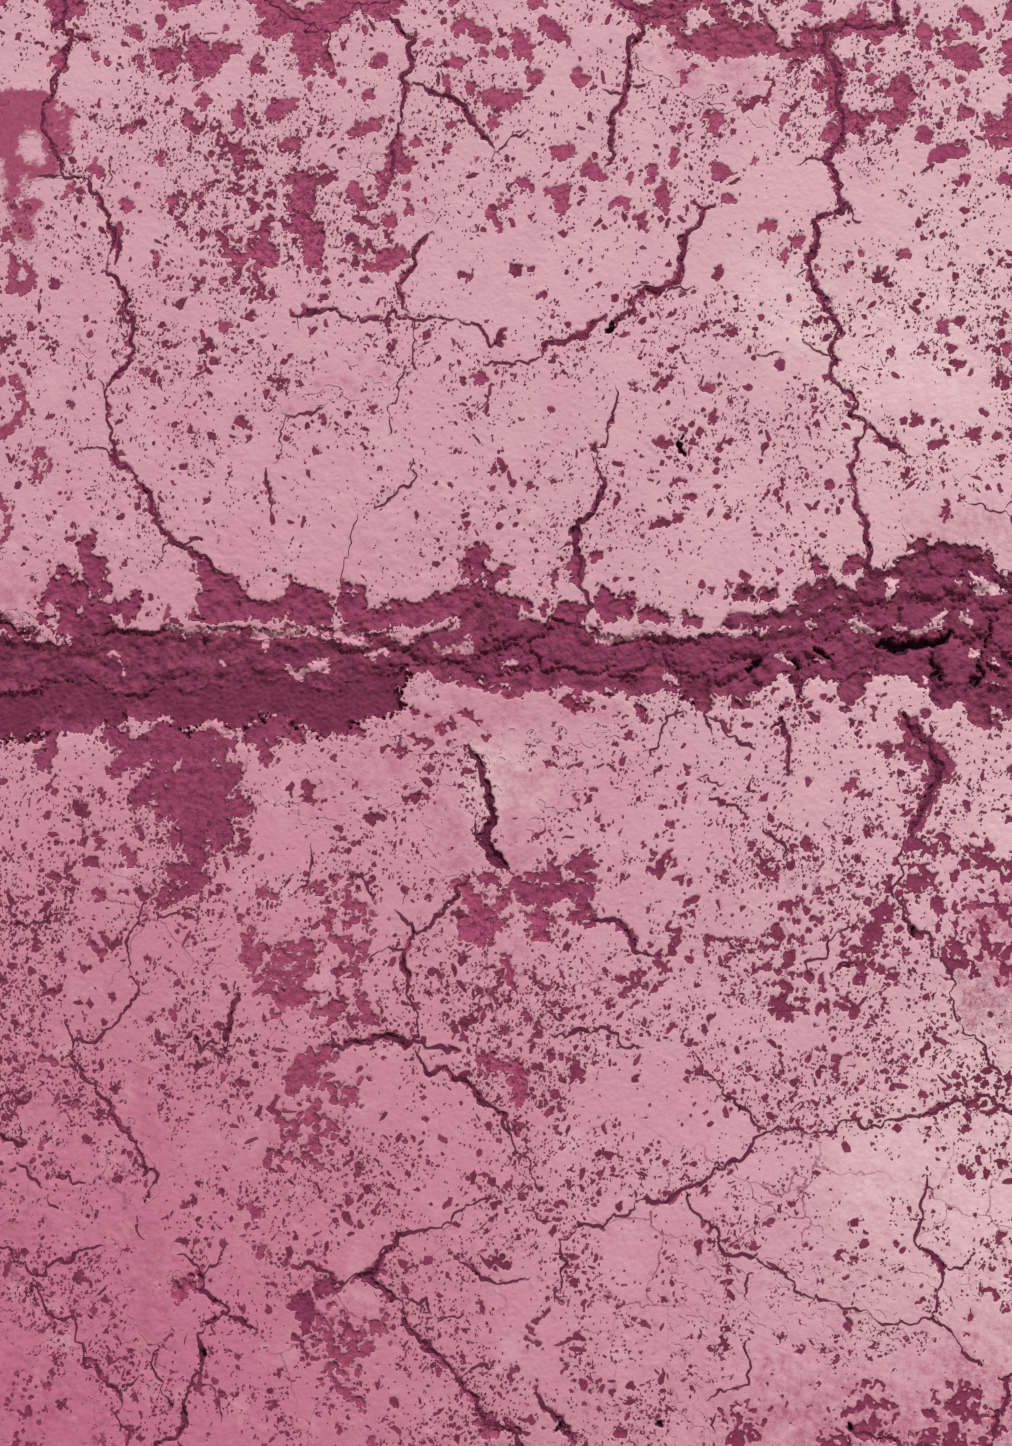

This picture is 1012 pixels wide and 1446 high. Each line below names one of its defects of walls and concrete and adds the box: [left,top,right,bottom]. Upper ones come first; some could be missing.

peeling [0,84,106,296]
crack [38,0,219,573]
peeling [124,0,422,310]
crack [264,0,528,178]
crack [289,200,716,443]
crack [753,0,907,575]
flaking render [0,524,1012,1041]
peeling [230,861,390,1183]
peeling [448,845,602,1109]
crack [298,660,1012,1446]
crack [0,1241,258,1446]
peeling [804,1366,1012,1446]